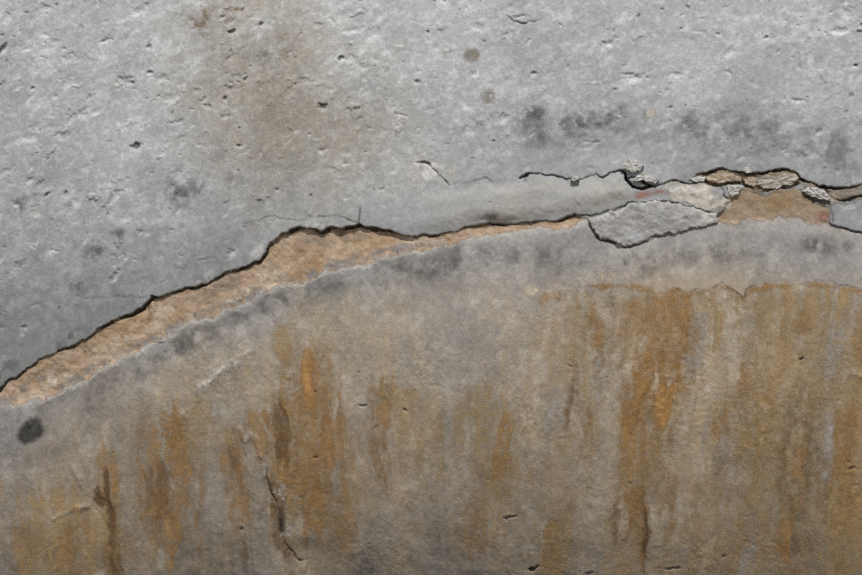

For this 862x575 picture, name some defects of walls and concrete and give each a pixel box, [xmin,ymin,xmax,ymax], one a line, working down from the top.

crack [58,249,268,352]
crack [289,214,438,238]
spalling [0,157,862,406]
crack [558,215,634,249]
crack [600,171,654,190]
crack [674,168,862,202]
water stain [20,418,43,443]
rust [94,453,124,574]
rust [137,407,192,570]
rust [249,348,349,557]
rust [623,285,699,554]